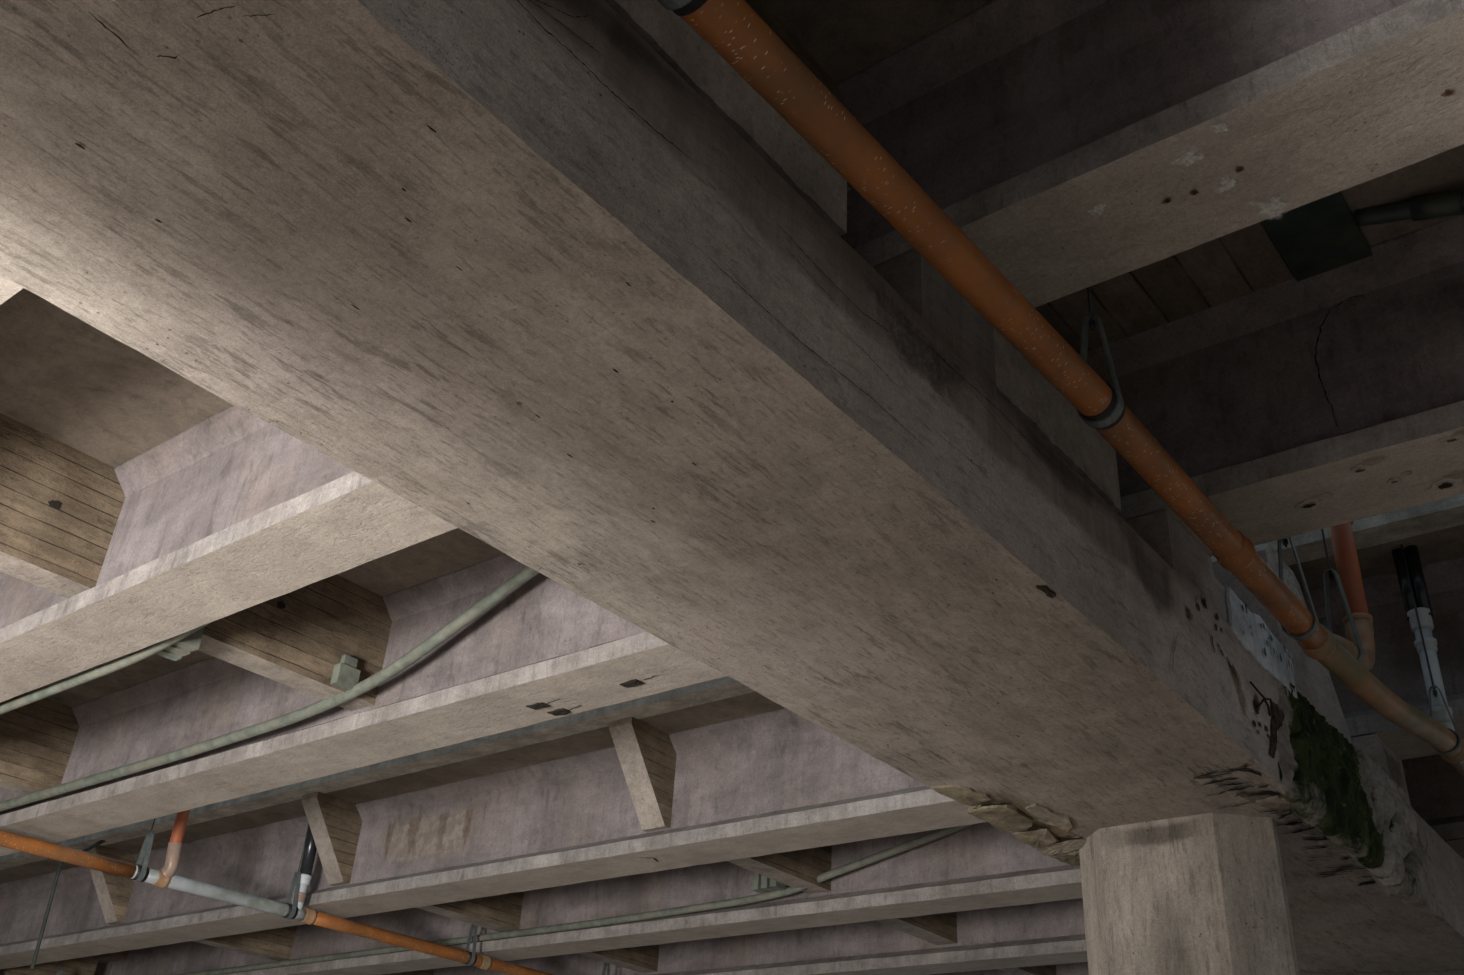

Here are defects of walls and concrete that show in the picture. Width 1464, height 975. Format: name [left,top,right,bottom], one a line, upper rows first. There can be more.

crack [1315,295,1362,427]
spalling [1249,681,1285,758]
spalling [931,785,1087,867]
spalling [1194,747,1439,916]